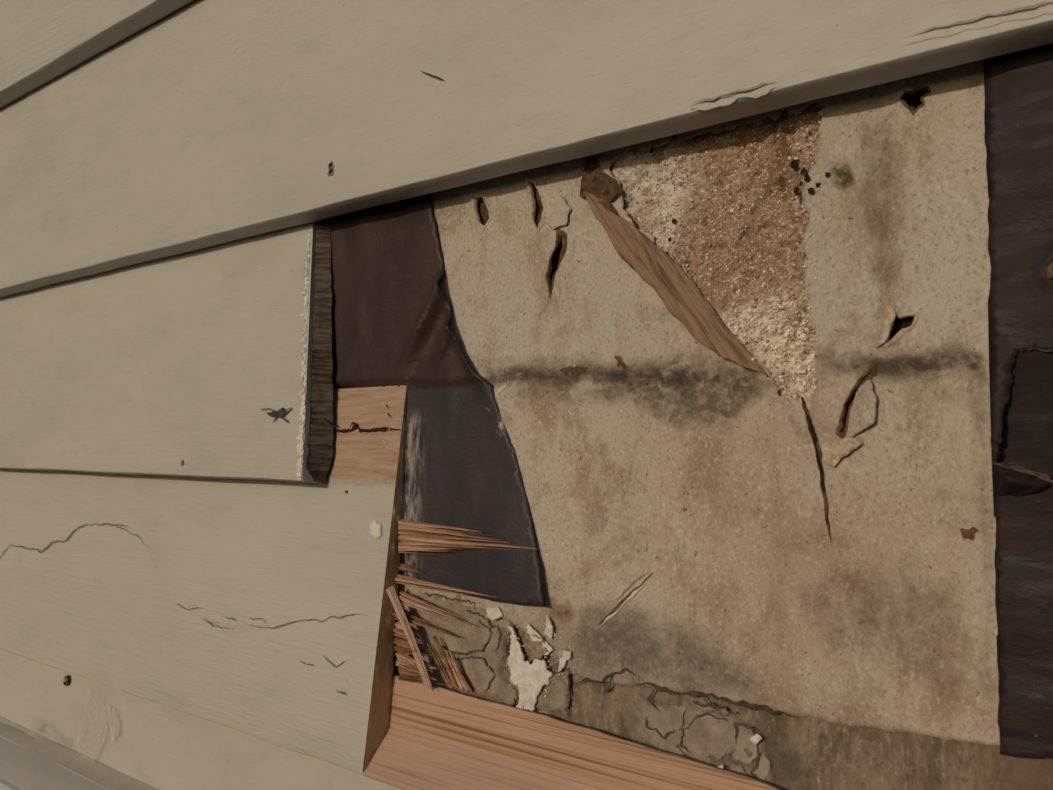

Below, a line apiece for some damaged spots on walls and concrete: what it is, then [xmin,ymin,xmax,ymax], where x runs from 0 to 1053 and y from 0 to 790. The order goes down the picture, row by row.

peeling [584,191,769,376]
damp [482,370,579,398]
damp [594,368,727,415]
damp [854,359,938,375]
crack [0,520,158,566]
crack [575,667,794,717]